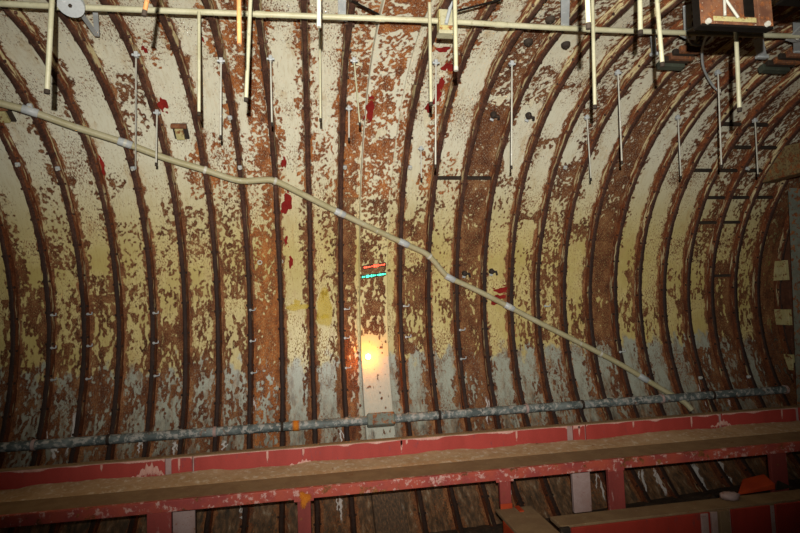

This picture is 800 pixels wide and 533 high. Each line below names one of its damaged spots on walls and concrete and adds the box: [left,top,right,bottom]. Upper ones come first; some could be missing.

peeling [157,98,169,114]
corrosion [17,0,733,466]
corrosion [667,41,800,413]